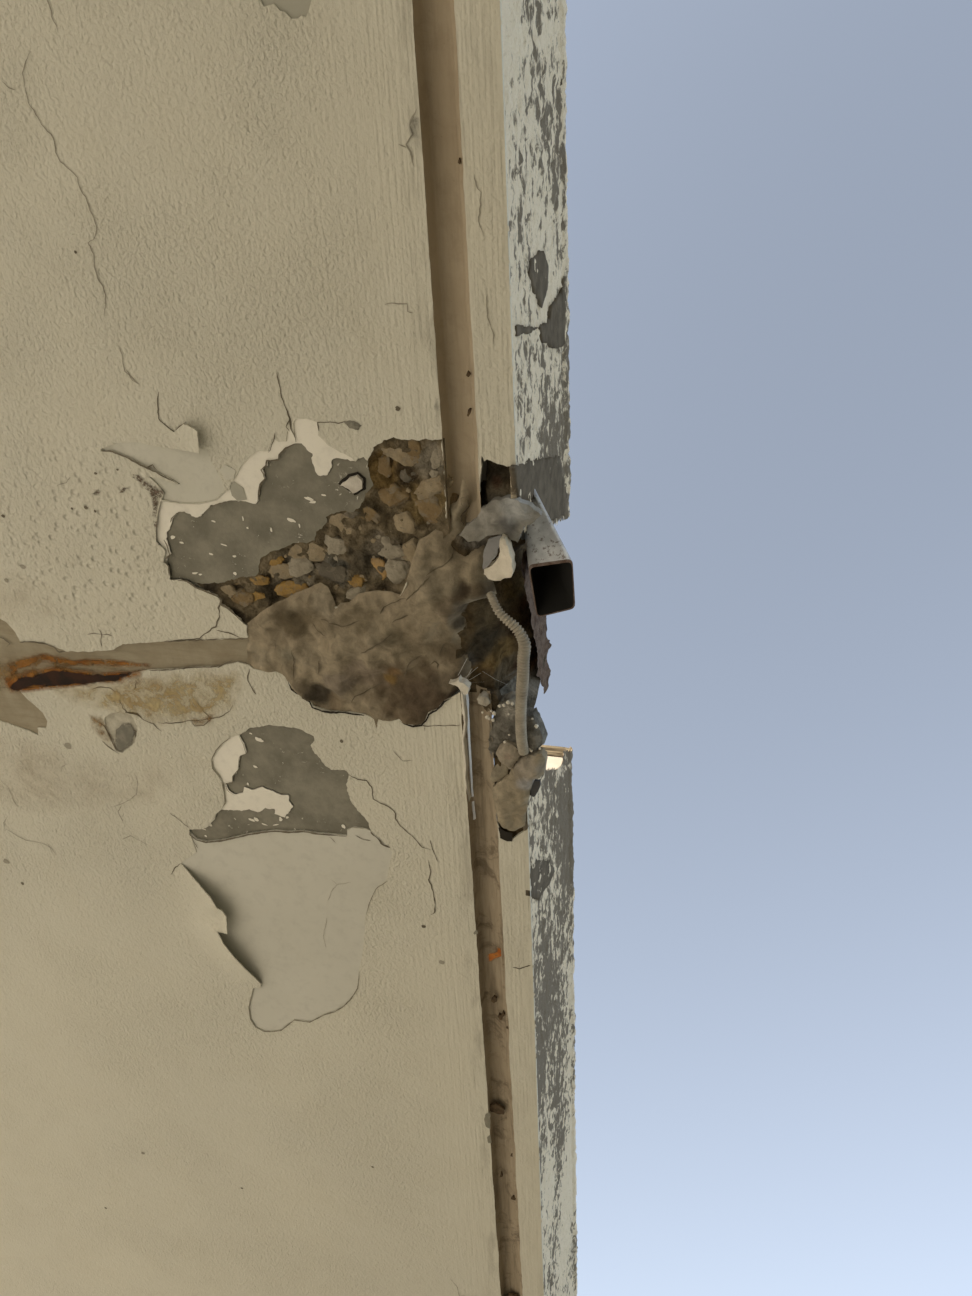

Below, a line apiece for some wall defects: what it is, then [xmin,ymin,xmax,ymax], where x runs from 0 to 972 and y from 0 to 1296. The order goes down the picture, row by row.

peeling [261,0,311,19]
crack [2,54,106,314]
peeling [480,455,567,521]
spalling [102,418,547,708]
peeling [0,619,21,642]
corrosion [4,654,148,691]
peeling [0,688,47,734]
spalling [101,711,142,754]
peeling [530,779,541,797]
peeling [182,725,392,1032]